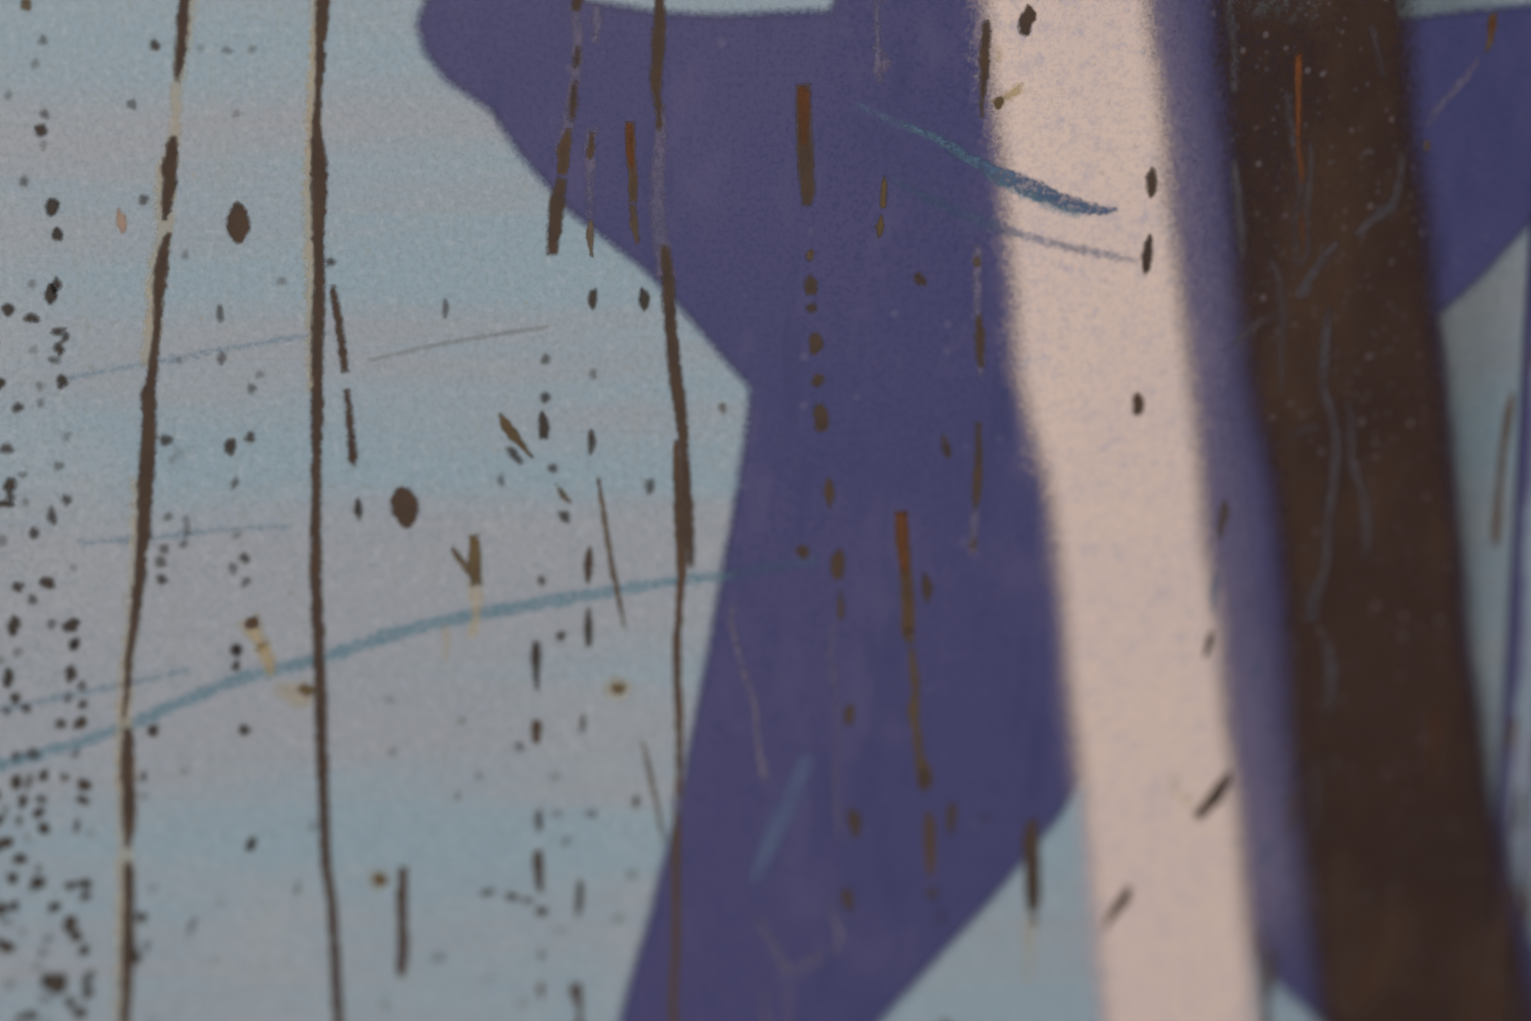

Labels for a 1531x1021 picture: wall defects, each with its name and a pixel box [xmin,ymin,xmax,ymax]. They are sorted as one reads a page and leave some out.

corrosion [795,83,816,206]
corrosion [45,198,62,240]
corrosion [2,304,68,355]
corrosion [45,278,60,304]
corrosion [225,433,254,455]
corrosion [0,478,15,507]
corrosion [13,577,55,602]
corrosion [56,618,86,729]
corrosion [894,510,933,791]
corrosion [0,750,50,834]
corrosion [1022,818,1041,926]
corrosion [0,816,95,1019]